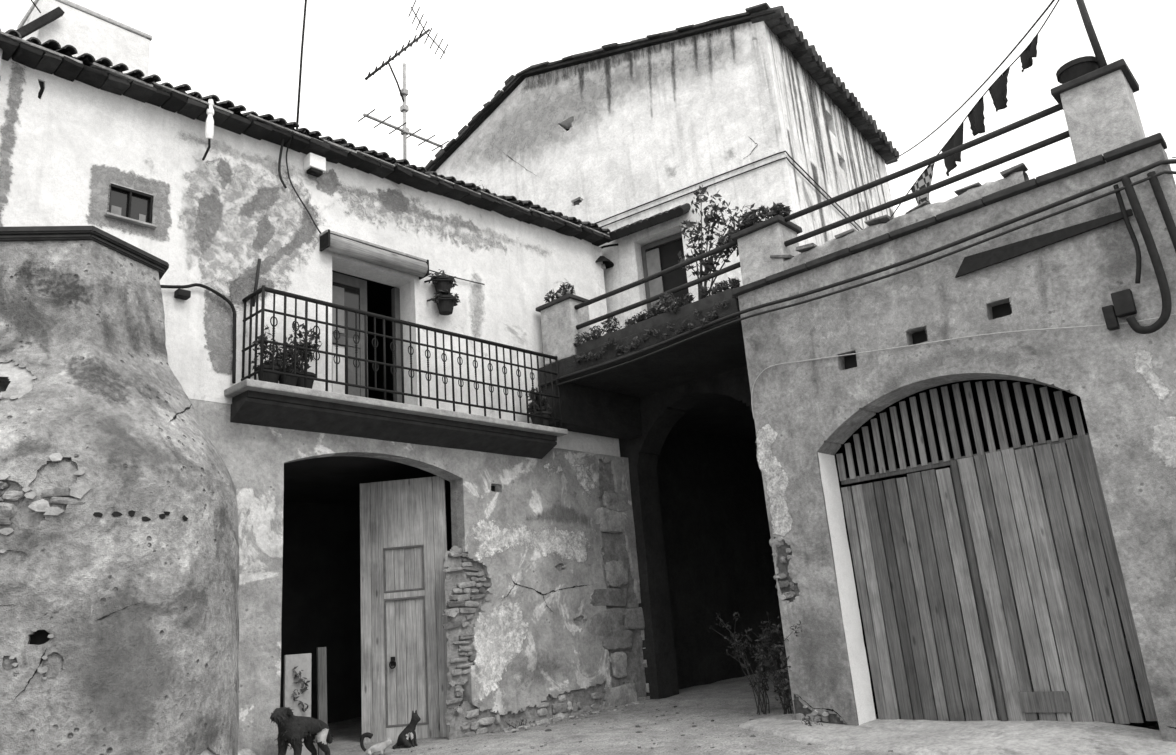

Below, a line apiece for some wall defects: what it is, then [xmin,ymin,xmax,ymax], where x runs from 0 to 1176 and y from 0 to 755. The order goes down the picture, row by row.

water stain [469,25,737,159]
flaking render [0,361,37,400]
flaking render [0,453,188,570]
flaking render [756,424,800,602]
flaking render [442,456,647,740]
crack [501,574,597,613]
crack [14,648,47,700]